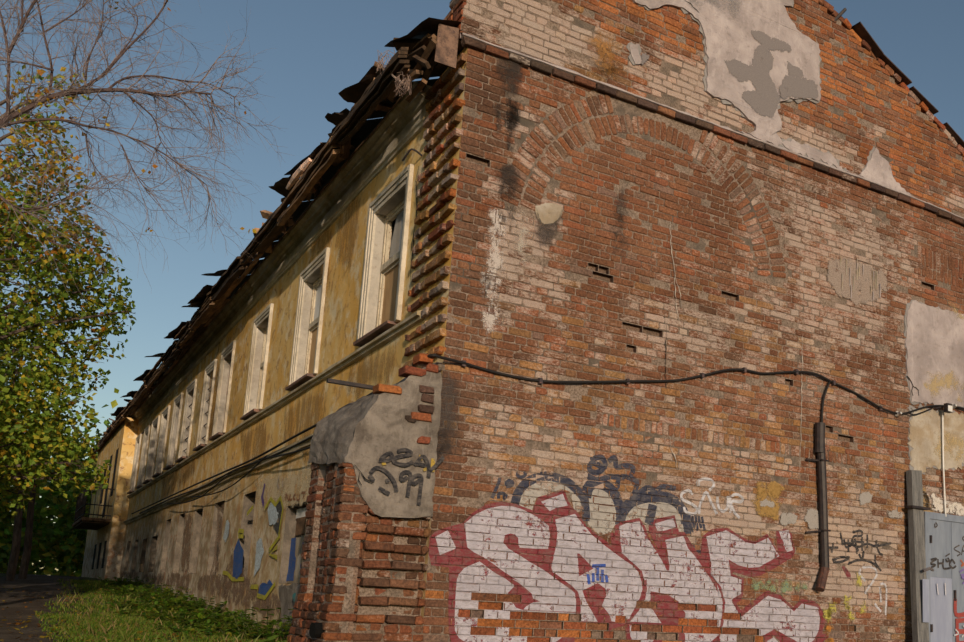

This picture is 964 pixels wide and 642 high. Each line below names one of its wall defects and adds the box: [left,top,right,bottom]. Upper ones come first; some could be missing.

leakage [496,60,522,149]
peeling [626,42,649,65]
peeling [632,0,911,195]
leakage [483,165,519,330]
flaking render [373,353,439,423]